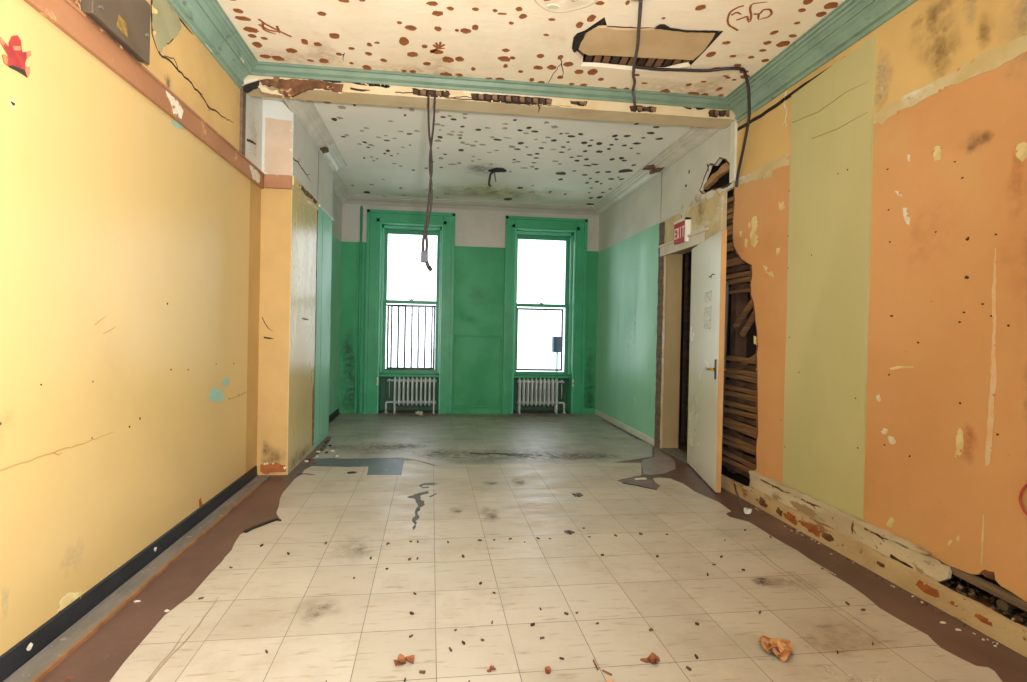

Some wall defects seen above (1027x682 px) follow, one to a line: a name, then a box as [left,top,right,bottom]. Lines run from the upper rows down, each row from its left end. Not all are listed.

peeling [397,1,475,77]
peeling [576,1,604,28]
crack [151,0,256,145]
spalling [258,76,393,121]
spalling [412,48,629,105]
peeling [873,35,1027,125]
spalling [341,105,663,205]
peeling [699,153,790,194]
peeling [981,233,1010,466]
peeling [756,497,834,542]
peeling [916,580,958,607]
peeling [758,635,794,662]